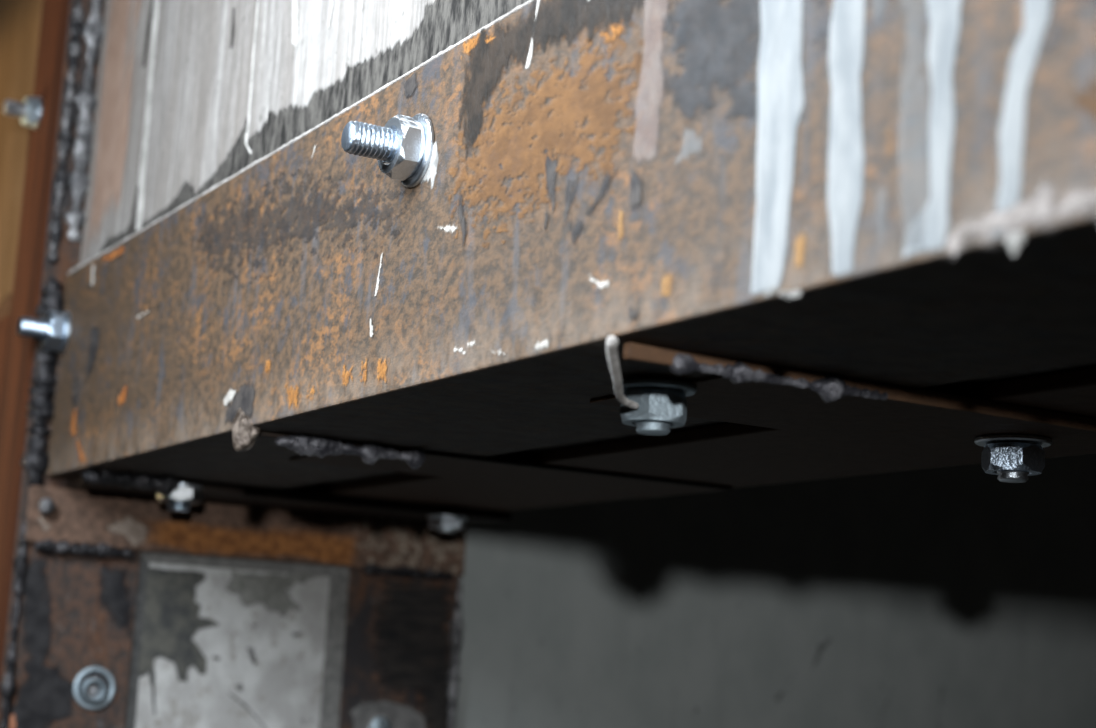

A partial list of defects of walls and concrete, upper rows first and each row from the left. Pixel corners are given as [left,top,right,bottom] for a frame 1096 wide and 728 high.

peeling [99,0,529,254]
rust [444,17,654,247]
leakage [902,0,962,258]
leakage [995,0,1062,213]
rust [661,275,672,296]
rust [794,235,805,266]
rust [285,385,315,408]
rust [342,359,390,385]
peeling [139,568,220,715]